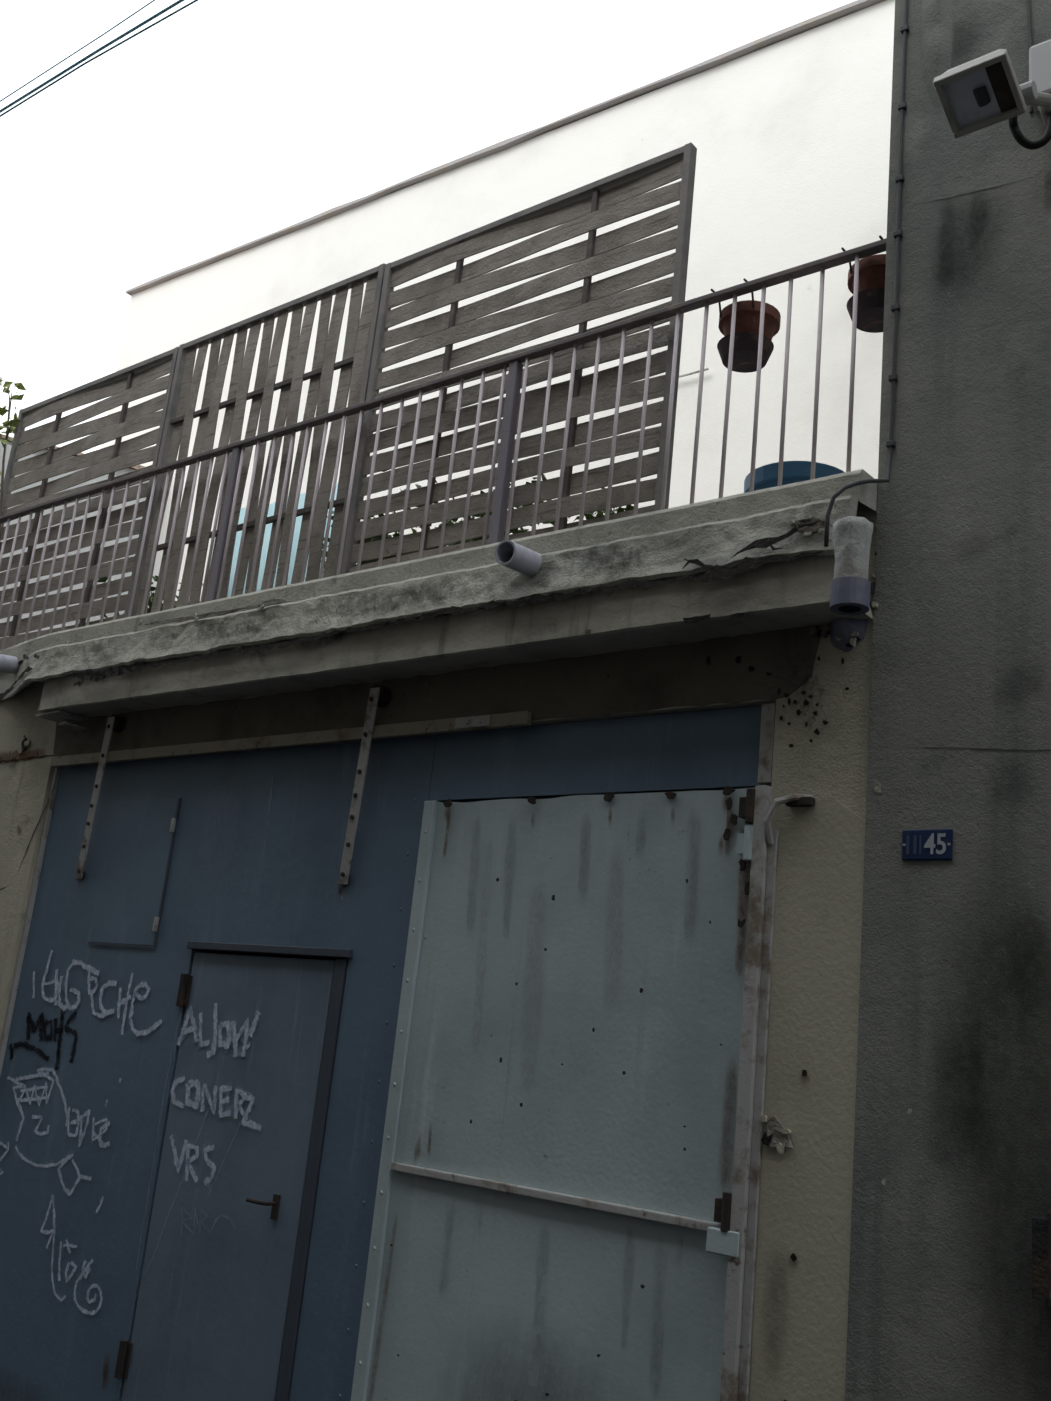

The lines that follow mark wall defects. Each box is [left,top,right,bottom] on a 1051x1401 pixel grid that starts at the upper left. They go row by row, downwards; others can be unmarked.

crack [84,520,823,676]
rust [719,786,743,849]
rust [737,856,751,971]